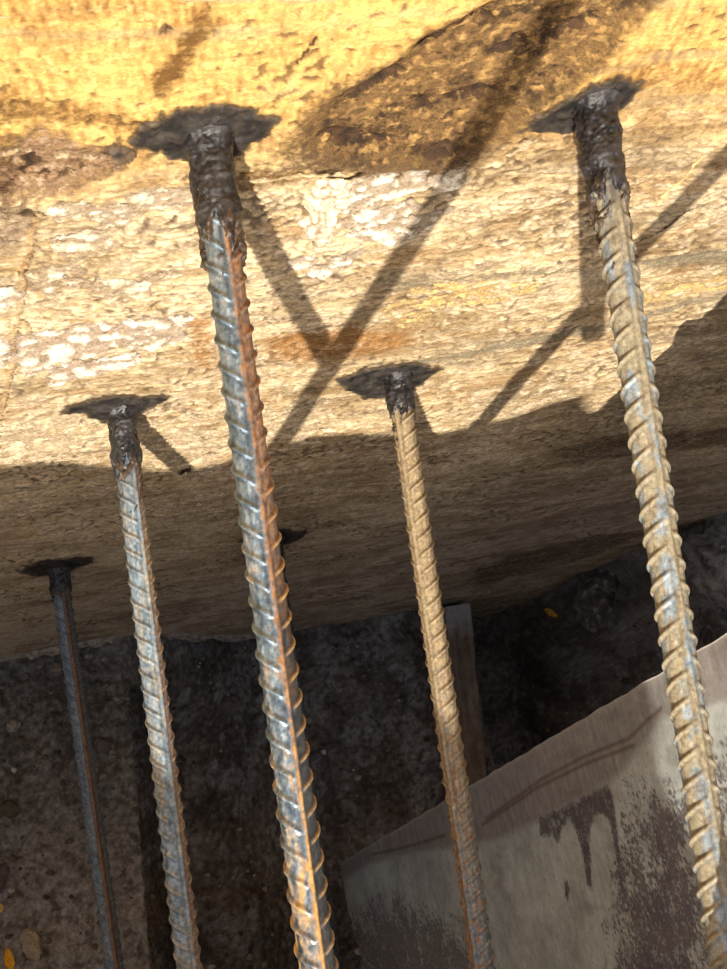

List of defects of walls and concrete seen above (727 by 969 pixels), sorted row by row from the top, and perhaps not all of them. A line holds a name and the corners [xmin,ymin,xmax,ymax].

water stain [236,0,624,191]
water stain [0,100,145,130]
rust [273,328,404,361]